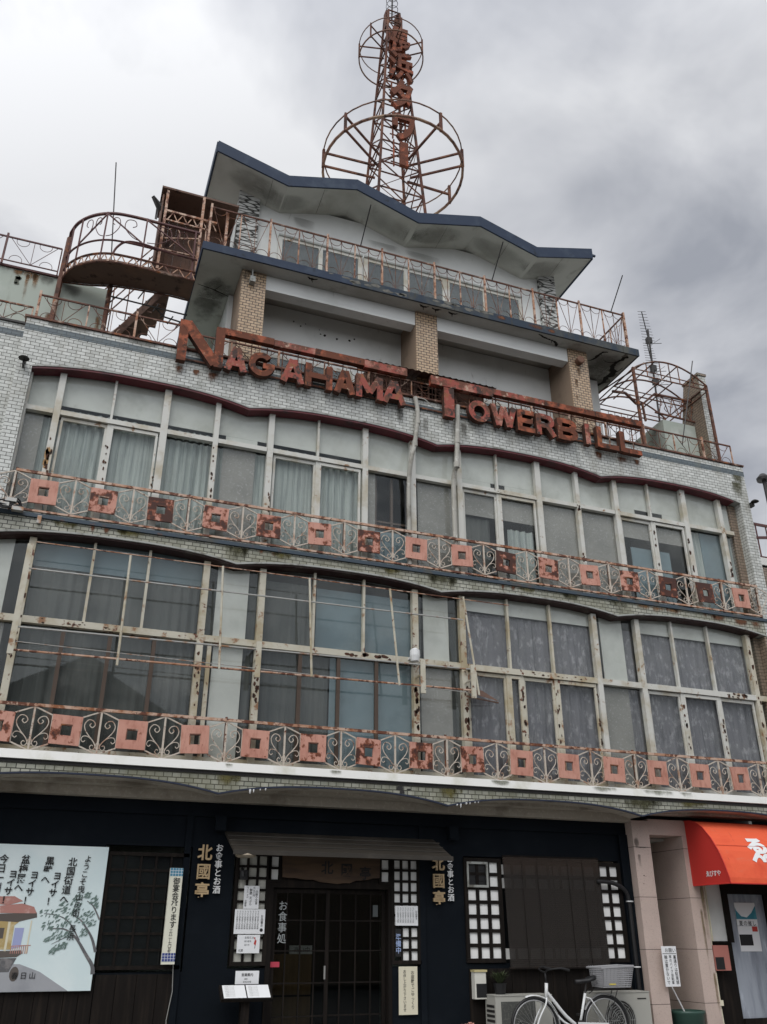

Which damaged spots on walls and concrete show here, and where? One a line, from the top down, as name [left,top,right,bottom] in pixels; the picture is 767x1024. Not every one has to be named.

crack [588,352,629,386]